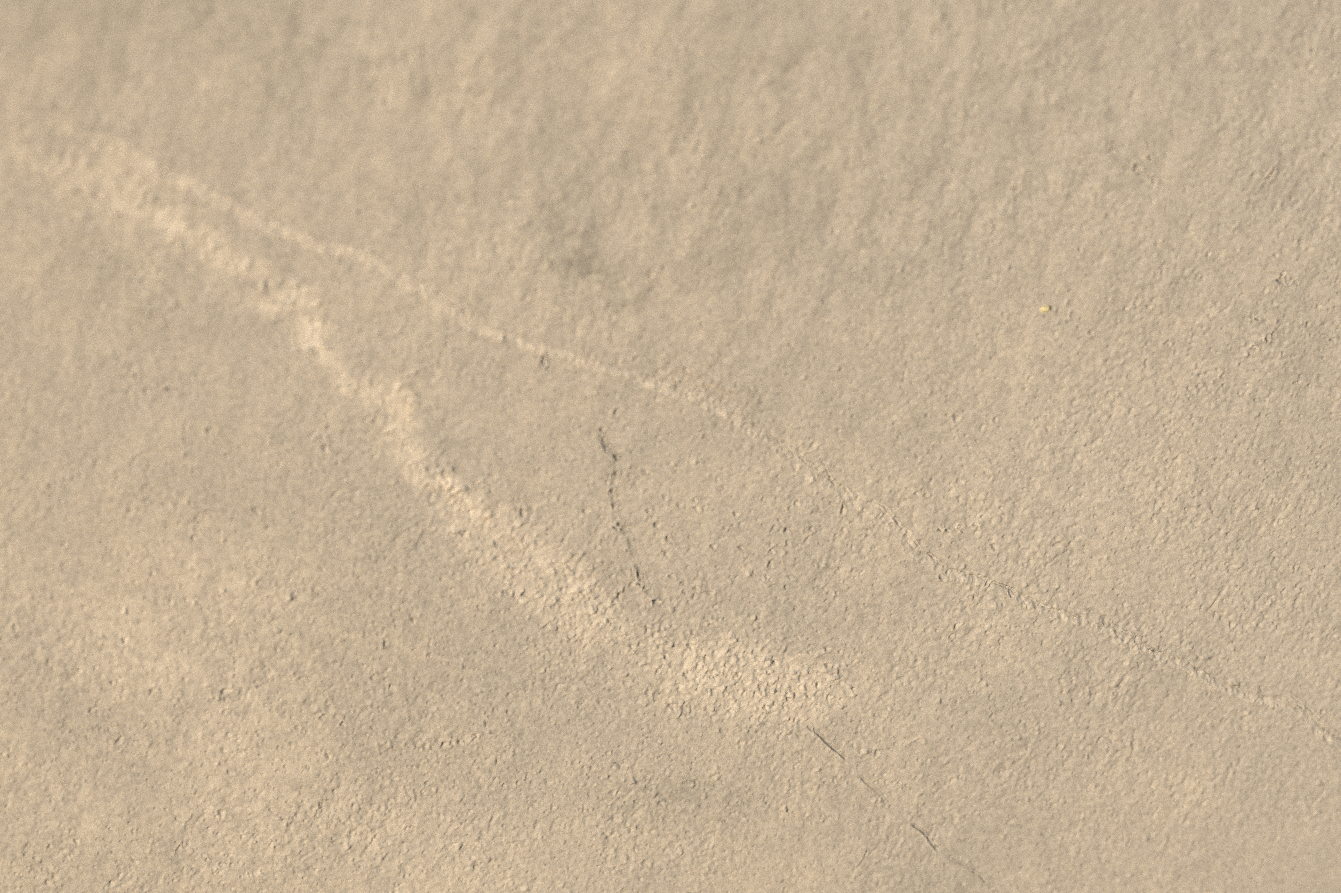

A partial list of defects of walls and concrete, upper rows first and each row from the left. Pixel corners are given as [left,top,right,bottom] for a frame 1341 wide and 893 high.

crack [42,103,1341,750]